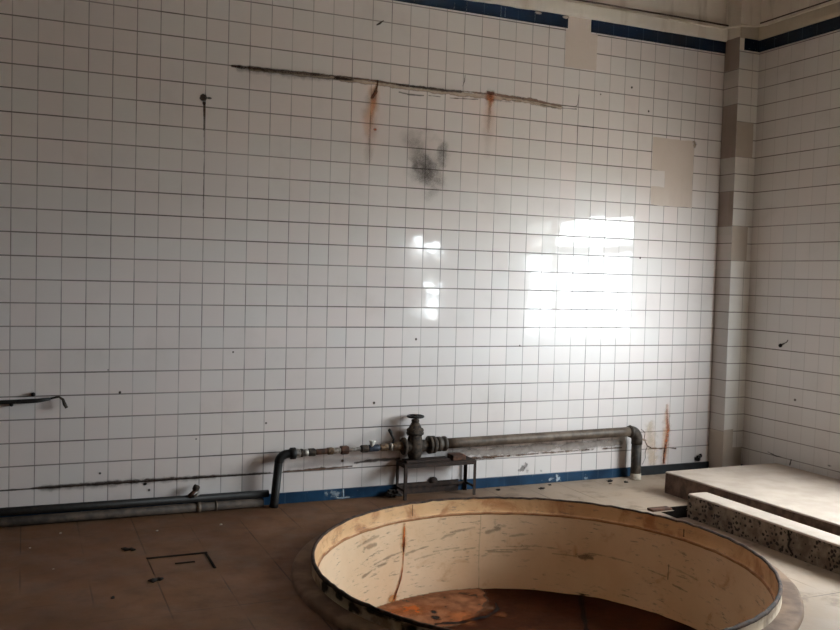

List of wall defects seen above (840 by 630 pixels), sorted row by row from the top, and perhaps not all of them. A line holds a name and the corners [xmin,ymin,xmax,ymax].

peeling [563,16,598,70]
crack [200,94,211,130]
crack [231,65,594,129]
peeling [650,137,696,208]
damp [0,472,270,491]
crack [389,505,413,602]
rust [377,588,500,627]